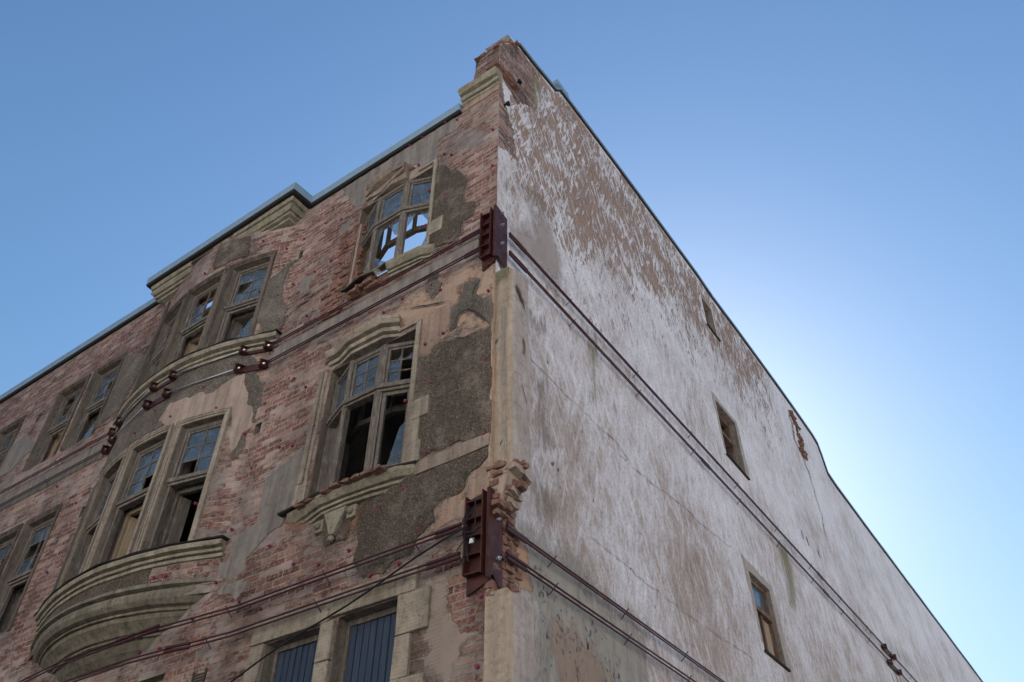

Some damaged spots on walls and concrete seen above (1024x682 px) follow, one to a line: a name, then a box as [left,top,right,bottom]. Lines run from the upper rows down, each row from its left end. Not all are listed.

peeling [439,39,808,461]
flaking render [159,341,339,481]
peeling [422,458,648,682]